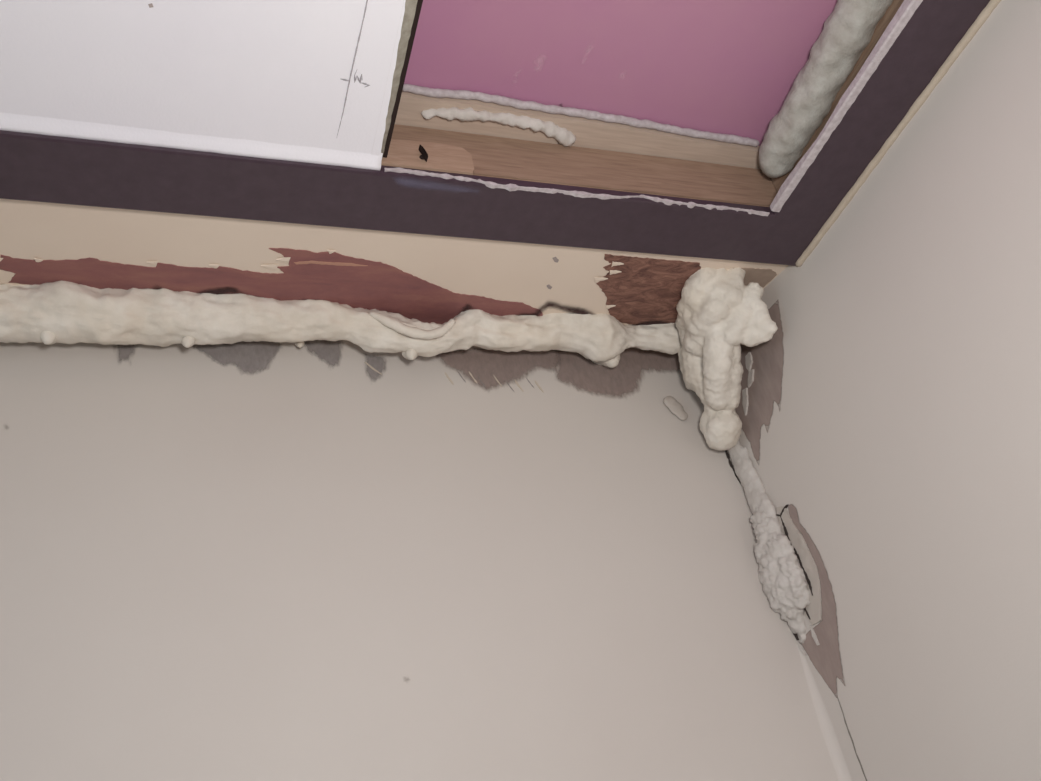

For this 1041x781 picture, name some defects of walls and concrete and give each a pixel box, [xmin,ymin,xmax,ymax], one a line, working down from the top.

peeling [0,248,543,324]
peeling [594,254,701,325]
peeling [735,300,784,461]
crack [725,450,741,484]
crack [752,505,813,640]
peeling [776,504,845,697]
crack [837,696,867,781]